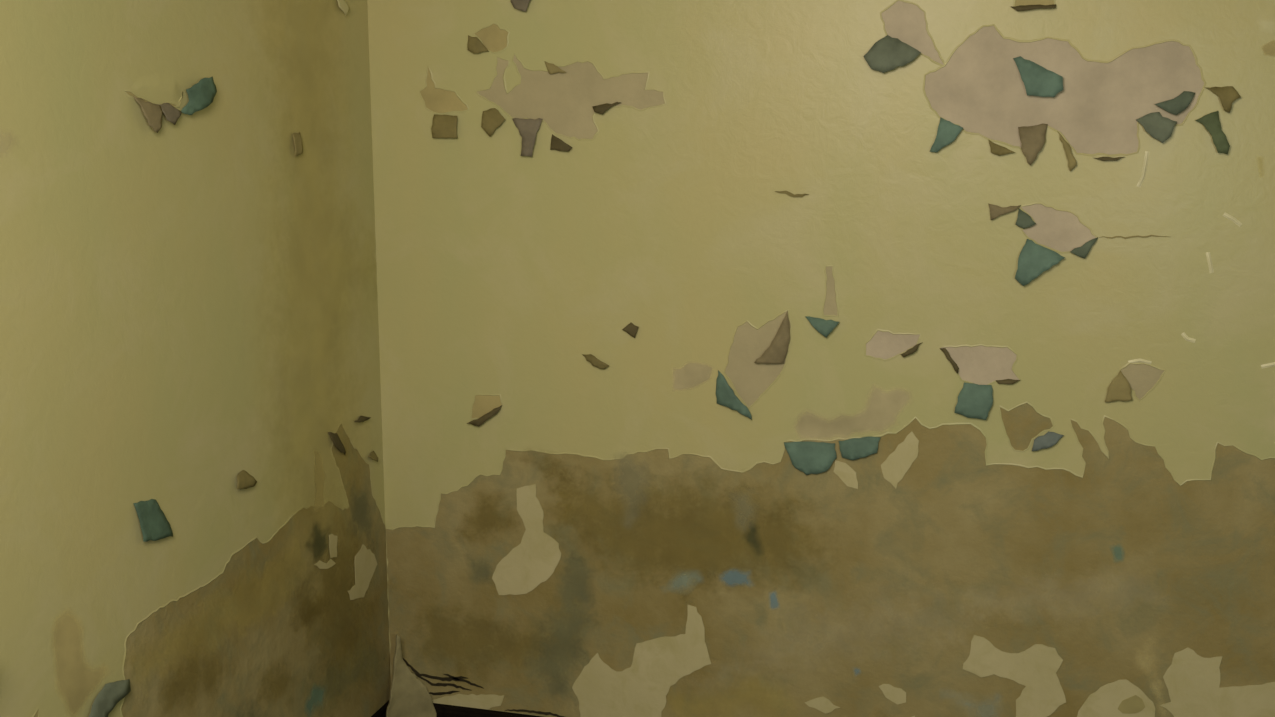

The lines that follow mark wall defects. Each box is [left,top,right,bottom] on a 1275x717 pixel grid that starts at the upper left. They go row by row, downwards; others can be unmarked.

peeling [510,0,530,12]
peeling [124,76,217,133]
peeling [419,22,666,157]
peeling [863,0,1241,171]
peeling [988,202,1098,286]
peeling [622,323,639,338]
peeling [715,310,792,420]
peeling [805,265,839,338]
peeling [55,344,1275,717]
leakage [571,494,798,586]
leakage [299,527,361,712]
crack [403,658,484,695]